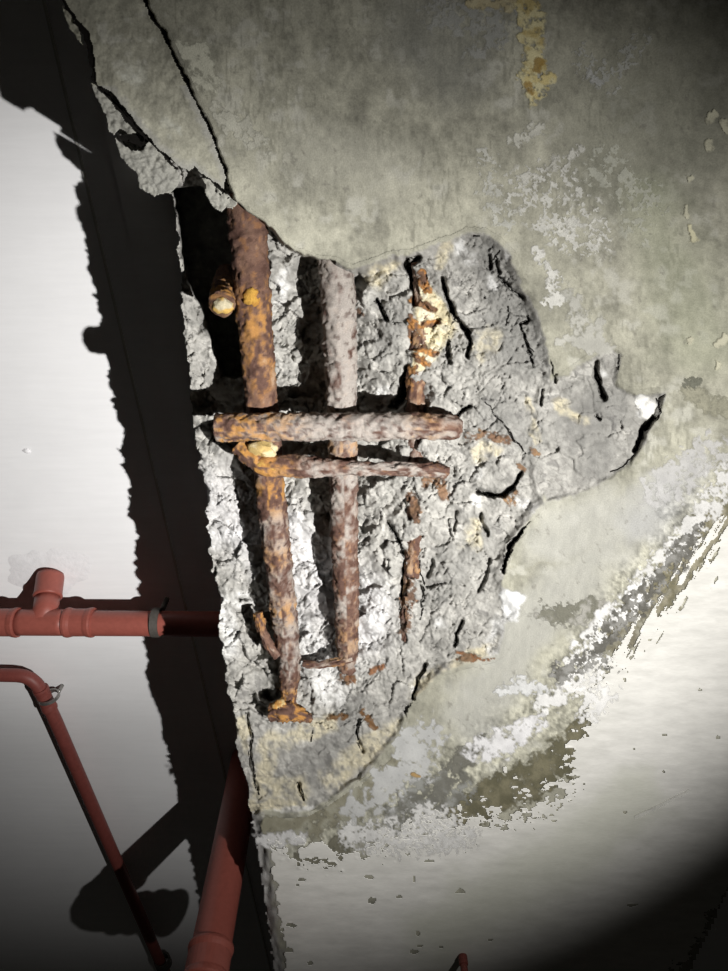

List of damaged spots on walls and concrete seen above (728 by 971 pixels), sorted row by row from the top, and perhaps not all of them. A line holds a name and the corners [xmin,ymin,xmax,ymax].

crack [62,0,178,170]
crack [143,0,229,199]
rust [465,0,557,106]
rust [407,269,452,371]
spalling [62,0,672,818]
rust [405,477,449,524]
crack [457,402,527,497]
crack [594,354,620,420]
crack [610,398,662,472]
leakage [255,430,728,870]
rust [327,709,378,730]
peeling [267,515,728,971]